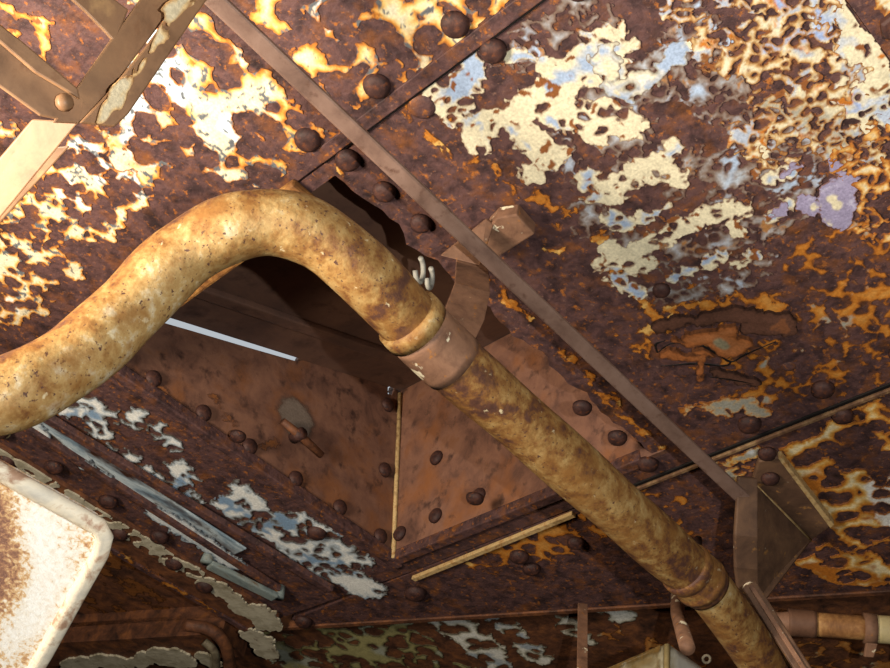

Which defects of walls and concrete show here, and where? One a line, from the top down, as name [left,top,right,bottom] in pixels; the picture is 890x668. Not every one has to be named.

peeling [0,0,337,331]
corrosion [423,129,452,159]
corrosion [491,163,578,228]
peeling [422,0,890,304]
corrosion [498,289,535,322]
corrosion [629,220,890,407]
corrosion [583,370,667,451]
peeling [58,397,389,600]
peeling [716,445,762,481]
peeling [778,395,890,587]
corrosion [463,513,608,574]
peeling [263,618,555,668]